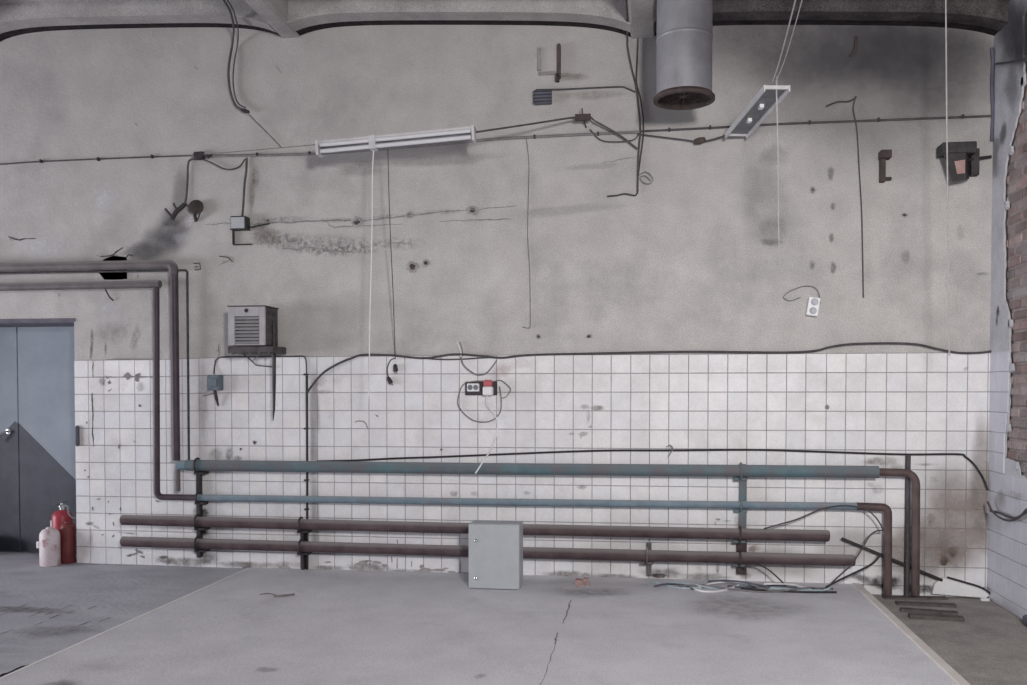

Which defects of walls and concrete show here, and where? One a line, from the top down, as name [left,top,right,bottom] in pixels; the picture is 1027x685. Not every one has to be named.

spalling [93,250,132,282]
flaking render [1004,49,1027,477]
crack [540,600,571,685]